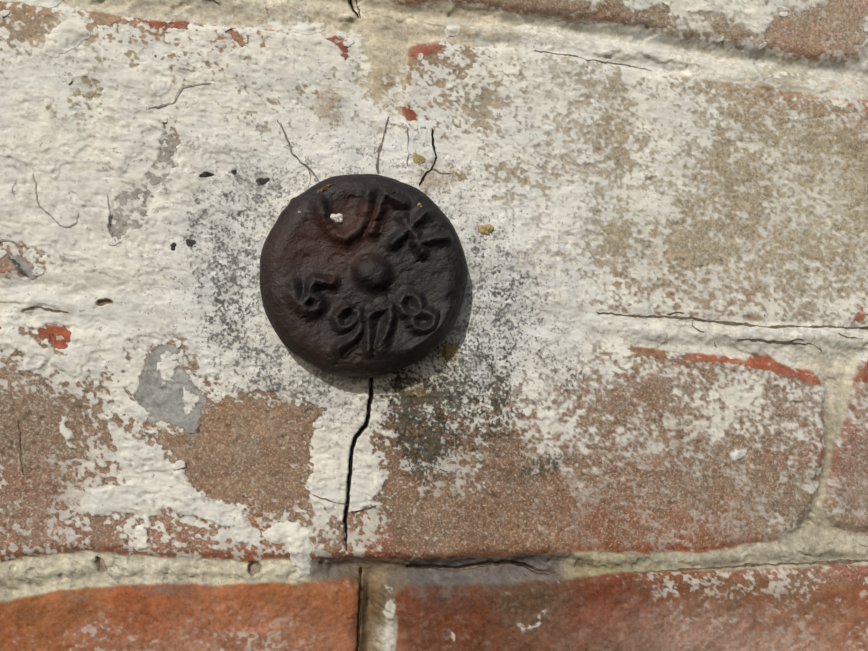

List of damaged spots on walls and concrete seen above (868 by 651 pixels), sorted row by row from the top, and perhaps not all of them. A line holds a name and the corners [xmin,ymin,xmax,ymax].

peeling [91,12,121,26]
peeling [138,19,188,29]
peeling [291,21,355,59]
crack [349,0,360,17]
peeling [394,0,670,28]
peeling [711,0,868,58]
peeling [108,117,179,246]
peeling [38,324,71,356]
peeling [683,353,820,385]
peeling [112,340,324,510]
crack [312,378,378,545]
crack [355,569,363,651]